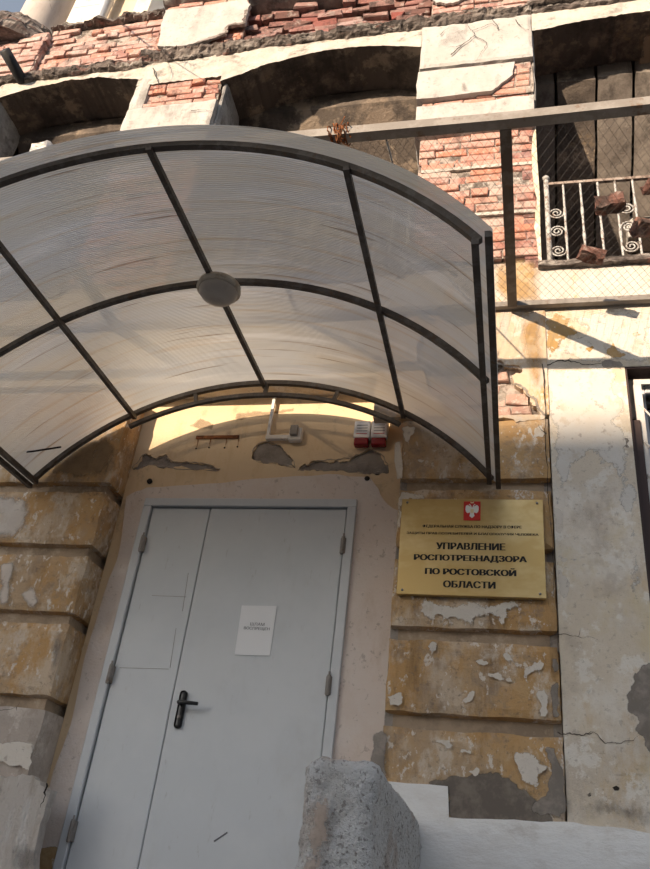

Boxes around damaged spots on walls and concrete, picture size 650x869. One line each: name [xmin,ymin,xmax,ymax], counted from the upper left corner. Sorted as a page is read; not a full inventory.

crack [440,19,530,55]
peeling [498,312,650,512]
spalling [132,454,220,471]
spalling [252,426,415,479]
peeling [553,498,563,533]
peeling [421,599,518,624]
peeling [476,659,512,682]
peeling [503,653,559,683]
peeling [388,692,403,705]
peeling [536,690,548,716]
crack [557,731,635,744]
peeling [0,741,33,770]